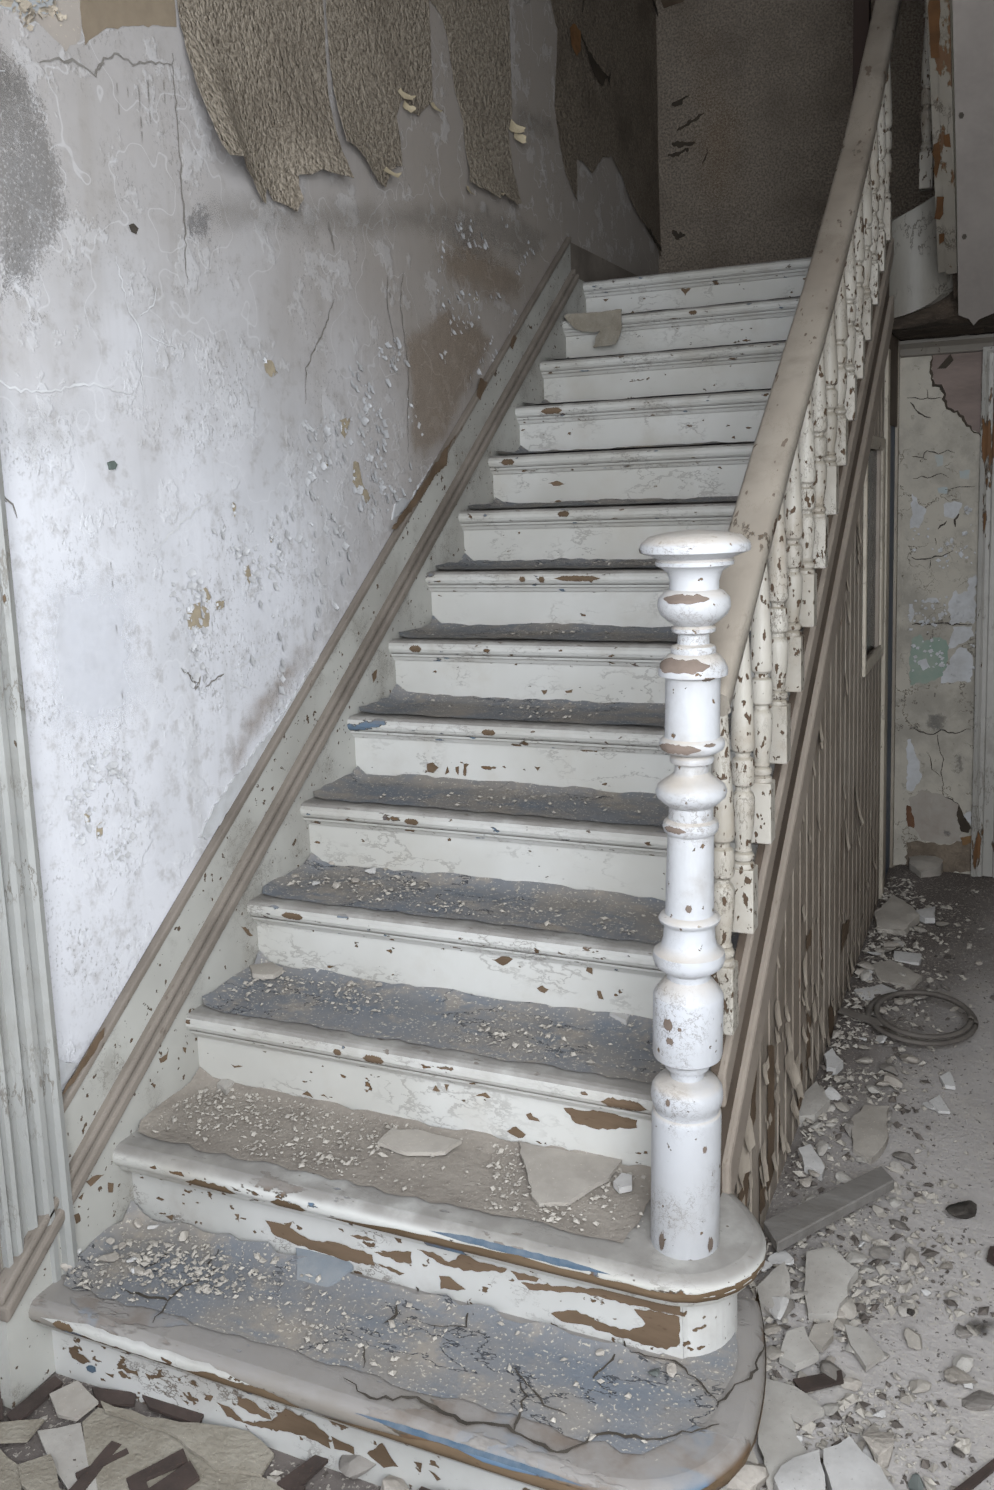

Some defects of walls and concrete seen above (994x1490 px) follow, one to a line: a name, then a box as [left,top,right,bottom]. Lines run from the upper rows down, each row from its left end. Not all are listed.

peeling [0,0,81,51]
crack [39,52,188,348]
crack [910,390,975,569]
peeling [907,494,977,683]
crack [912,620,972,628]
crack [914,728,966,805]
spalling [957,806,971,833]
peeling [74,1175,114,1224]
peeling [265,1220,680,1350]
peeling [69,1349,91,1364]
crack [344,1287,765,1453]
peeling [192,1395,441,1481]